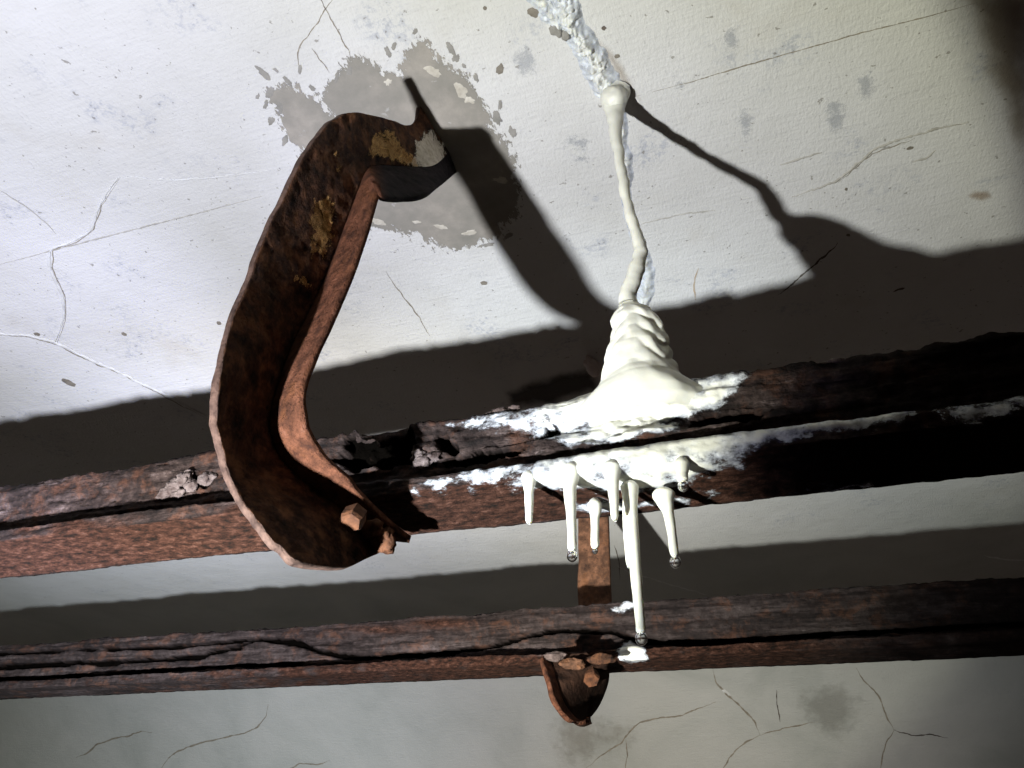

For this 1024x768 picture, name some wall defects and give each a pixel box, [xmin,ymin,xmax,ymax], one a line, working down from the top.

peeling [255,28,524,254]
crack [0,170,270,419]
damp [510,372,596,405]
crack [589,672,812,768]
crack [856,668,944,766]